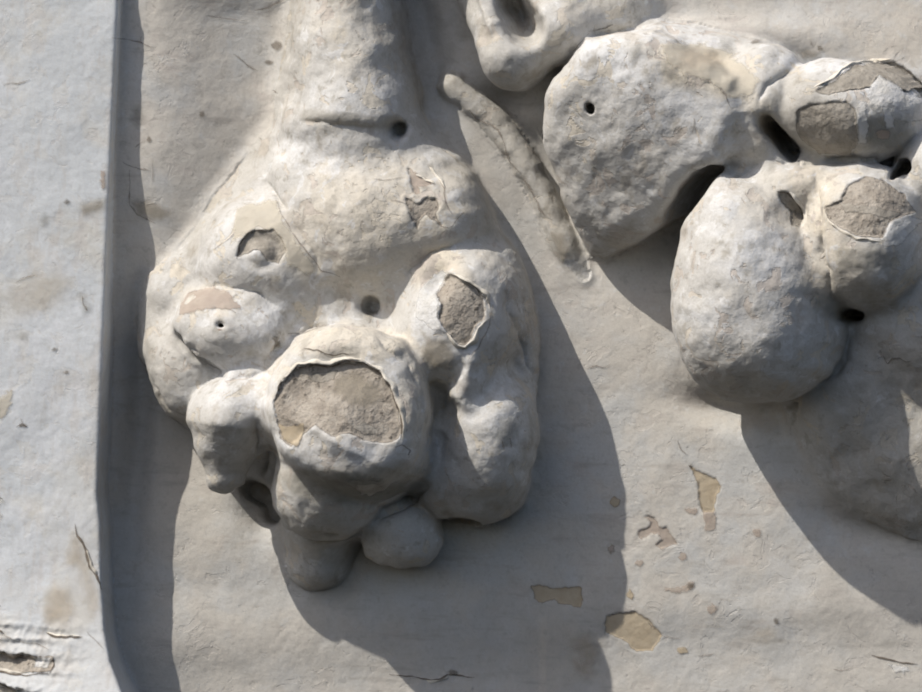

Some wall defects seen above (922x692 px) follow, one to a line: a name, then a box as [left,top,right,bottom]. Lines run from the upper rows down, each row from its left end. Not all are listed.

peeling [796,58,922,156]
peeling [233,201,329,275]
peeling [394,166,447,228]
peeling [824,176,922,246]
peeling [179,287,240,314]
peeling [416,271,491,353]
peeling [274,348,406,446]
peeling [685,466,720,531]
crack [75,527,102,589]
peeling [638,515,676,549]
peeling [531,585,583,607]
peeling [605,612,662,651]